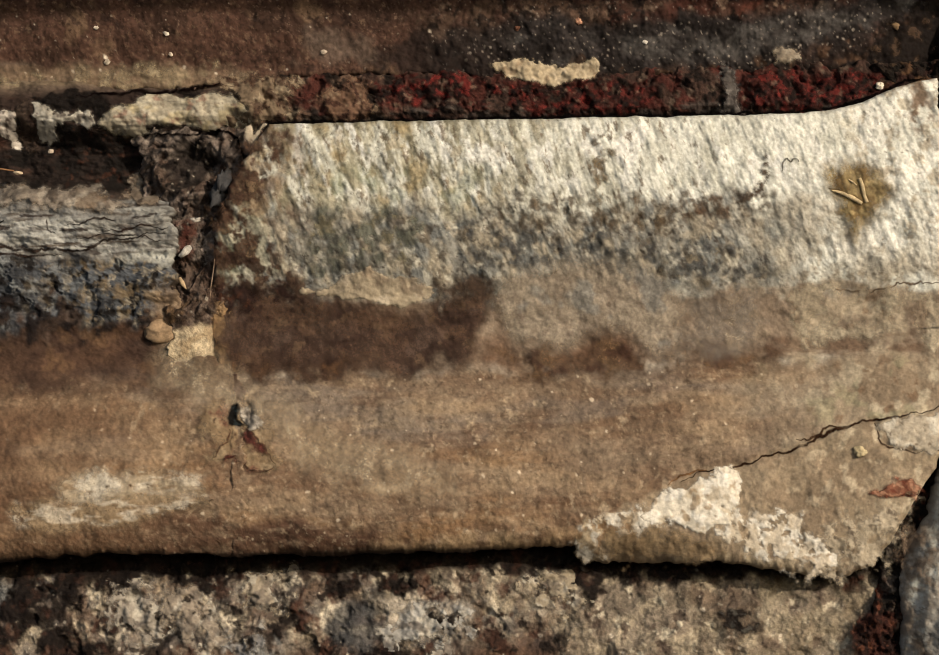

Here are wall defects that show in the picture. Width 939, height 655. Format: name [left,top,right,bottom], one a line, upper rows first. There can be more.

leakage [210,134,775,382]
crack [668,406,939,485]
spalling [576,465,902,584]
peeling [514,569,594,628]
rust [843,611,897,655]